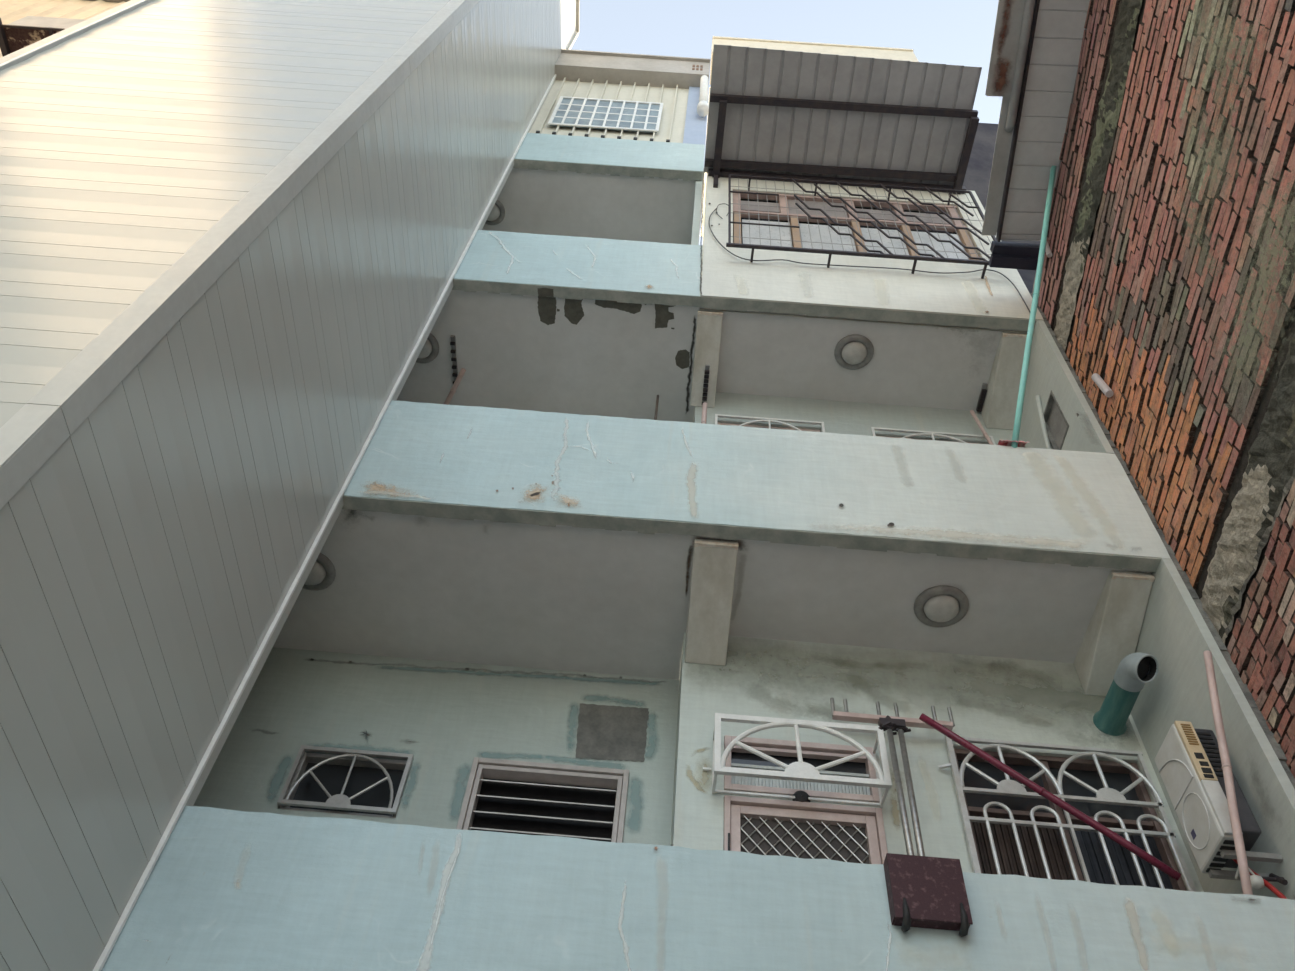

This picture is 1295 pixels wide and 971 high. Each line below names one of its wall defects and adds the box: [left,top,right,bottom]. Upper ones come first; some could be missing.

rust [994,0,1011,92]
peeling [537,288,674,329]
crack [671,180,705,412]
rust [496,475,554,500]
damp [945,671,1106,715]
crack [419,838,461,971]